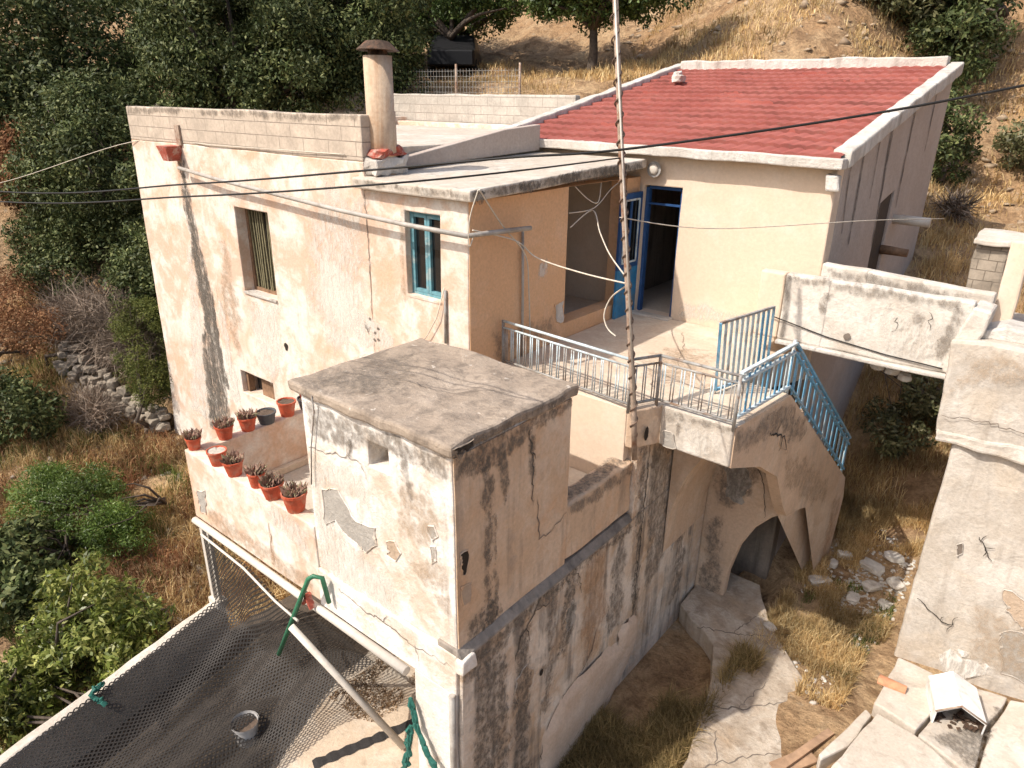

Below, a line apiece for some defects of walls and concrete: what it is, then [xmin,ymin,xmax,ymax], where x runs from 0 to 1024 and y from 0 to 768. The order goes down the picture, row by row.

water stain [179,160,239,426]
peeling [322,488,402,562]
peeling [427,525,438,565]
water stain [307,397,576,768]
crack [529,430,567,537]
water stain [568,444,672,632]
crack [917,598,958,632]
spalling [940,589,1024,683]